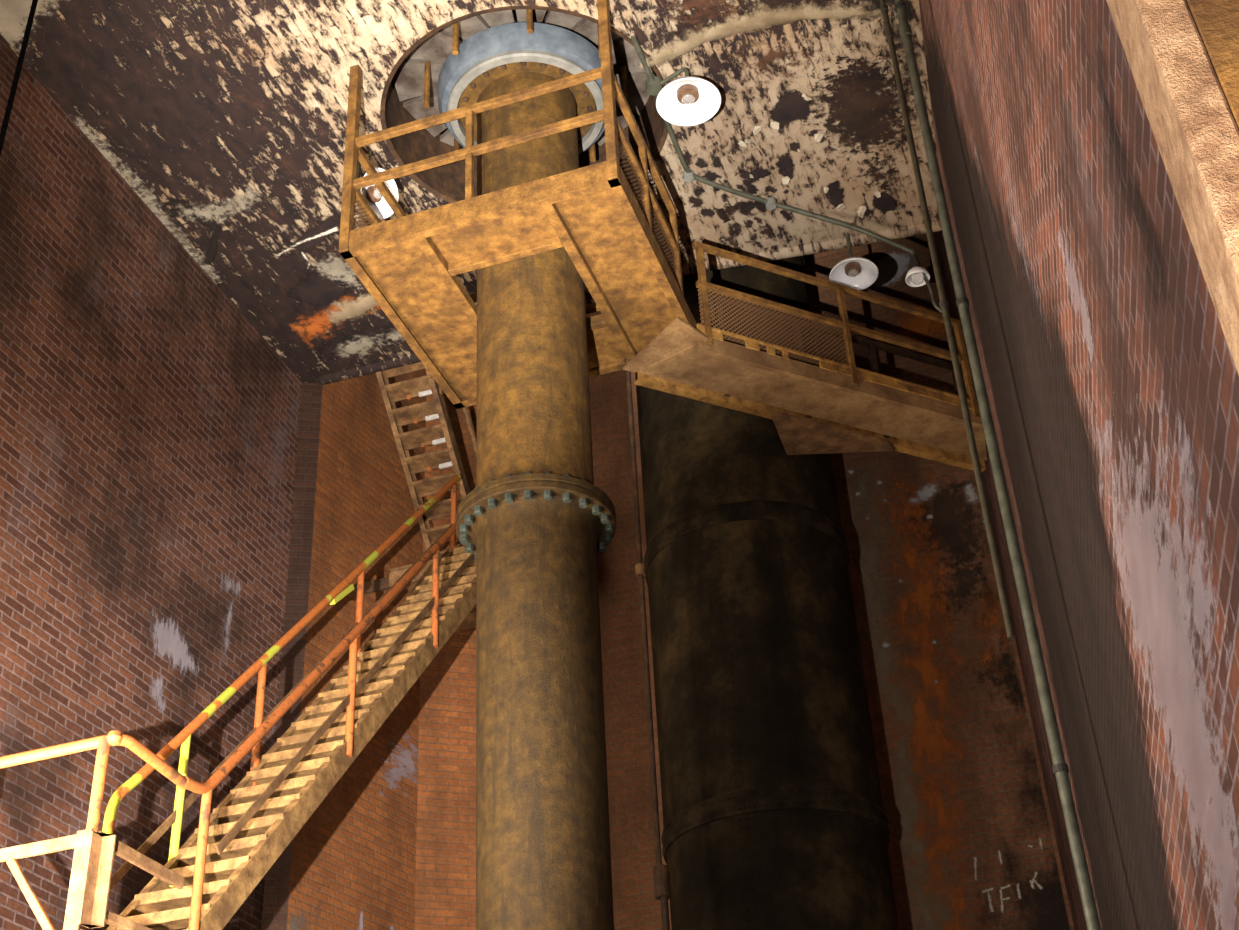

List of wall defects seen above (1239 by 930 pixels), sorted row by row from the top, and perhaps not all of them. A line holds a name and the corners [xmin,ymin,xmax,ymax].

peeling [654,0,867,37]
peeling [689,46,915,253]
peeling [280,212,341,257]
peeling [286,270,351,314]
corrosion [292,297,353,338]
peeling [314,323,397,361]
water stain [925,26,1239,930]
water stain [225,579,240,647]
water stain [154,619,195,670]
water stain [151,677,165,711]
water stain [895,741,949,930]